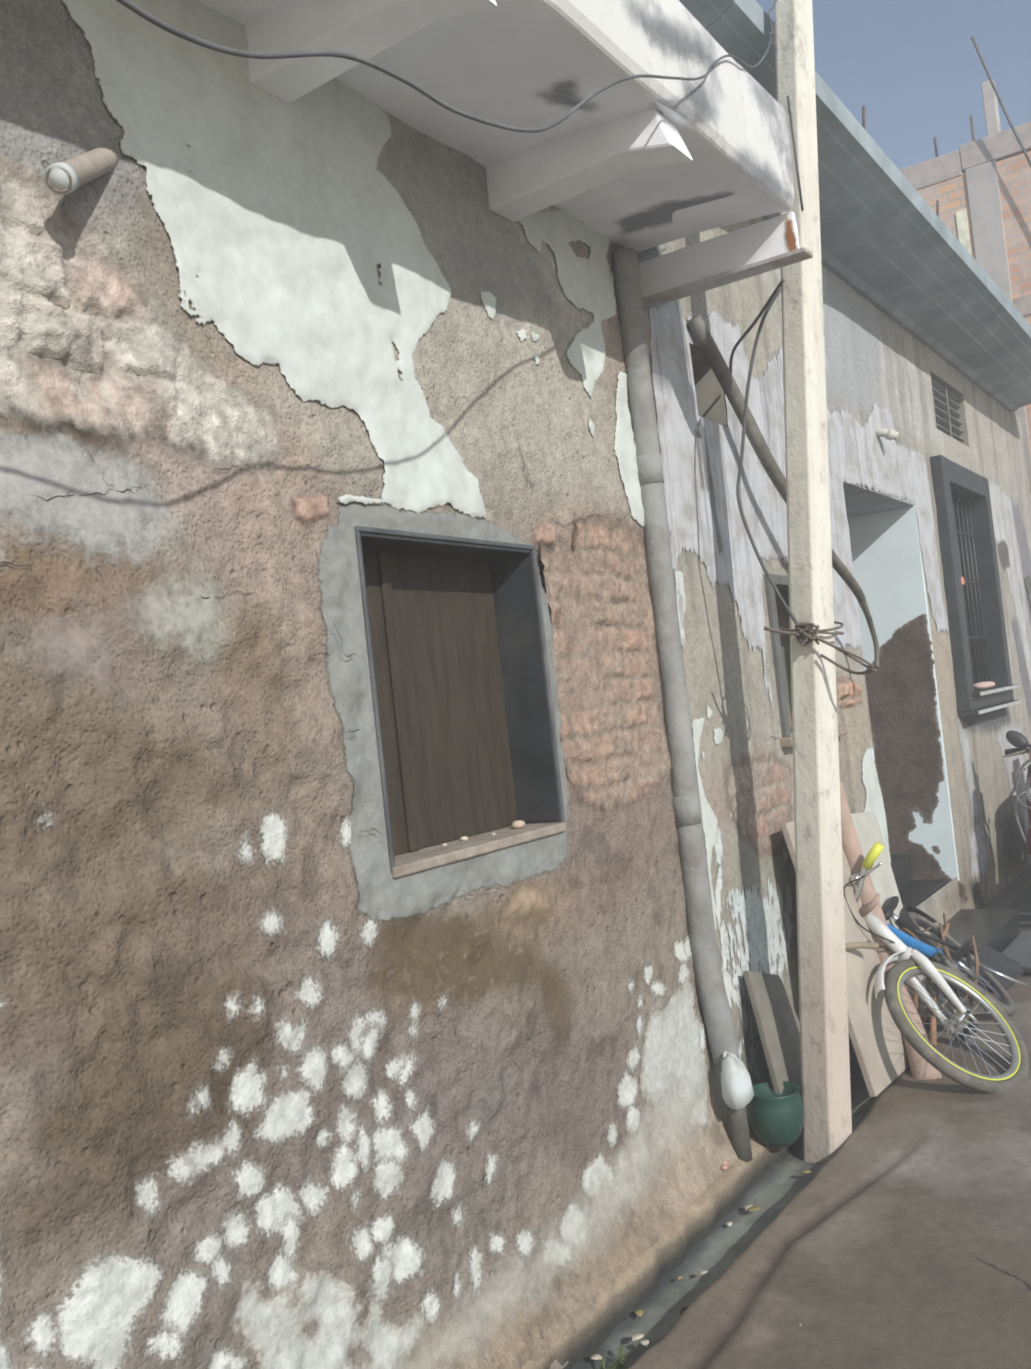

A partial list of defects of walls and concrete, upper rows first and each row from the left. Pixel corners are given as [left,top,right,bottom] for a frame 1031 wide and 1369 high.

flaking render [0,155,282,472]
peeling [62,0,488,522]
peeling [481,291,497,319]
flaking render [516,209,671,816]
peeling [649,300,788,711]
water stain [380,922,564,1032]